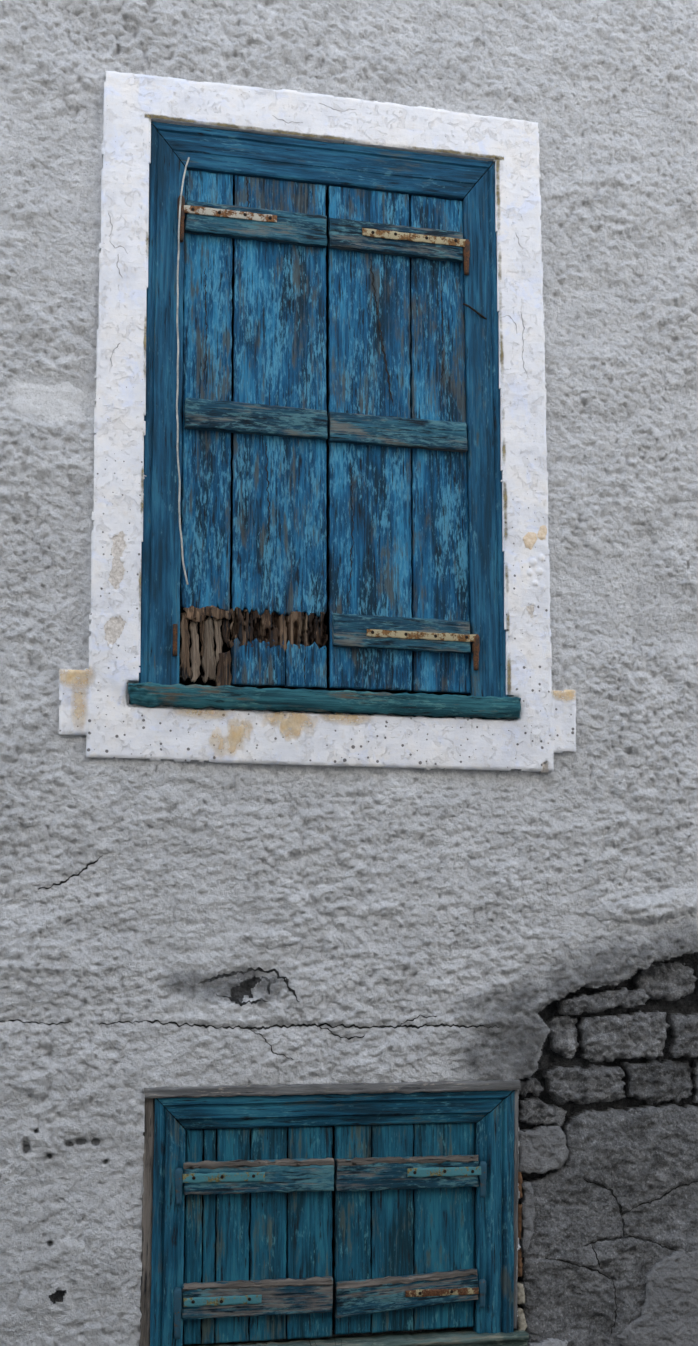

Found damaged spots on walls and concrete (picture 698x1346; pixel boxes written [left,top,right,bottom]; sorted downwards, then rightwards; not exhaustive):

spalling [177,967,299,1006]
spalling [498,952,698,1346]